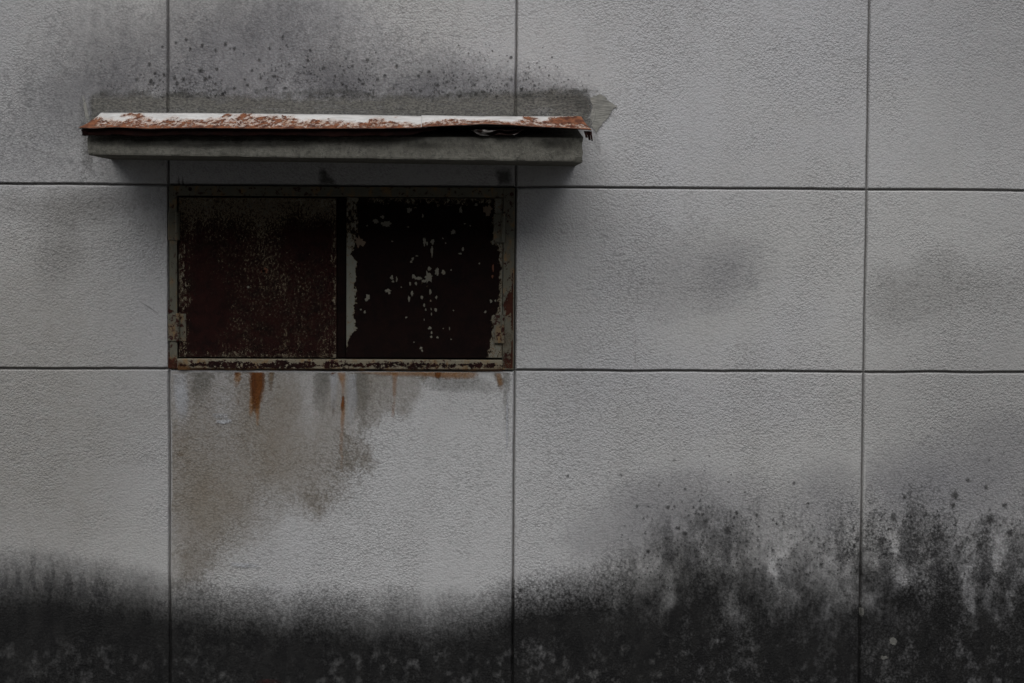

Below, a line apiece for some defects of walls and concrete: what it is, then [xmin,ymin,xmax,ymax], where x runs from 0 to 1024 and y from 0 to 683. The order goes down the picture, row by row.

leakage [75,6,558,101]
rust [79,113,592,130]
peeling [168,198,513,371]
leakage [172,380,315,540]
rust [235,372,274,415]
leakage [0,475,1024,683]